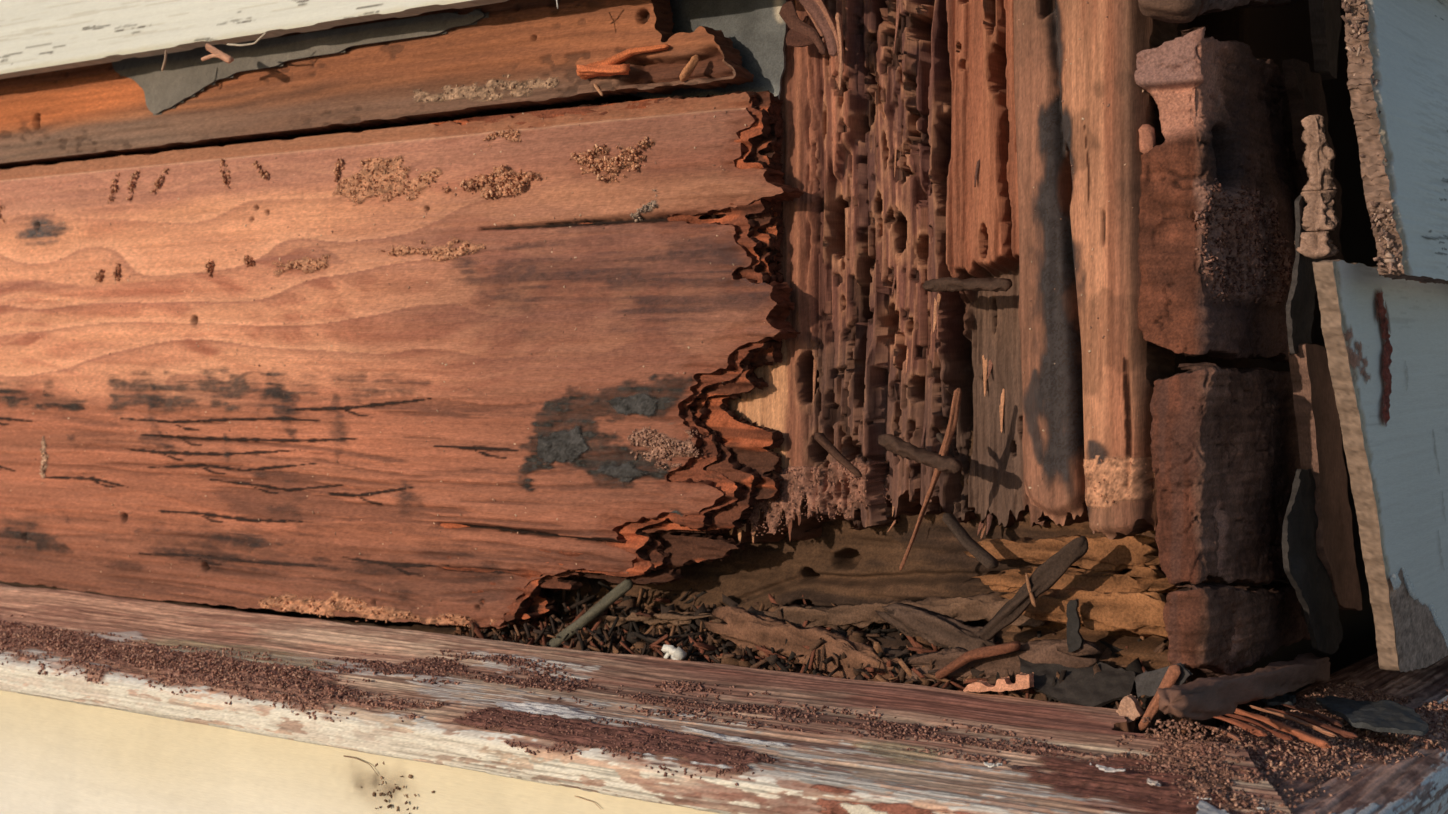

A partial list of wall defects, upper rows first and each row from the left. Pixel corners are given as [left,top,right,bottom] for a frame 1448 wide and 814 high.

crack [483,215,696,230]
water stain [1023,0,1106,485]
corrosion [1344,290,1393,426]
water stain [0,390,84,410]
water stain [109,372,314,447]
peeling [661,644,687,661]
peeling [1387,568,1448,673]
peeling [452,702,785,770]
peeling [810,784,971,814]
peeling [984,756,1231,814]